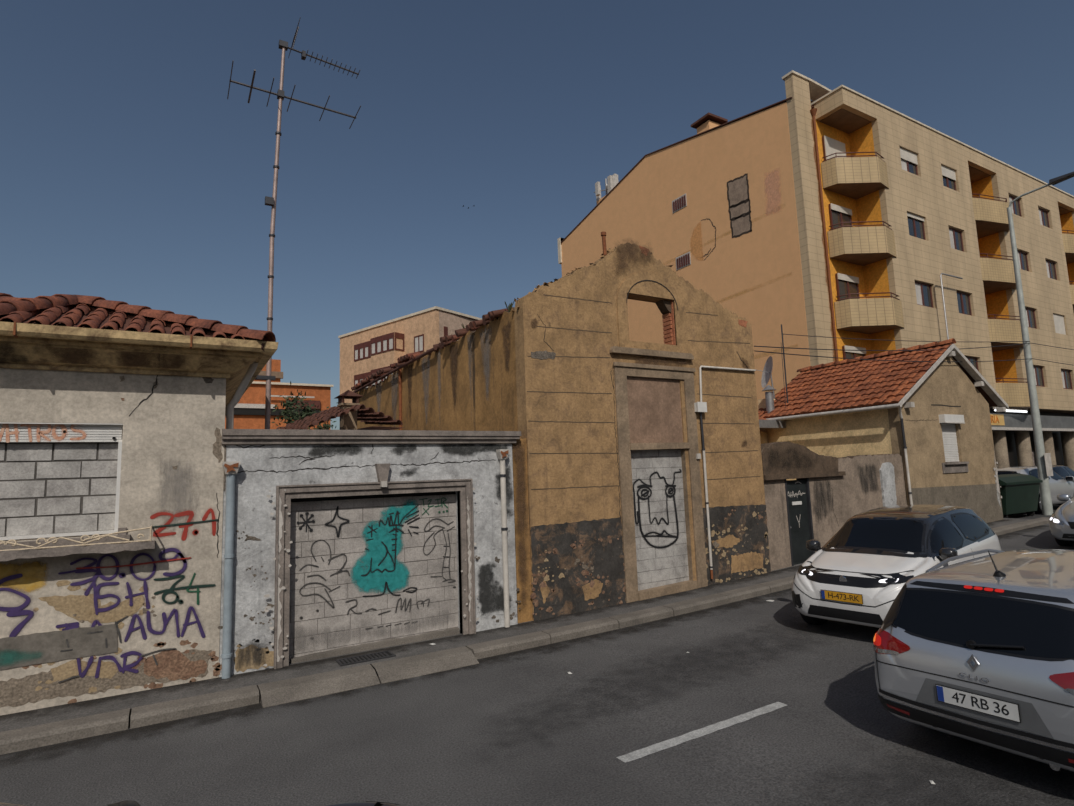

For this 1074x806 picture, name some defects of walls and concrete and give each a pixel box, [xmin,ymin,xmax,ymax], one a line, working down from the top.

crack [129,375,158,416]
flaking render [0,489,293,707]
peeling [461,488,626,622]
peeling [705,509,769,583]